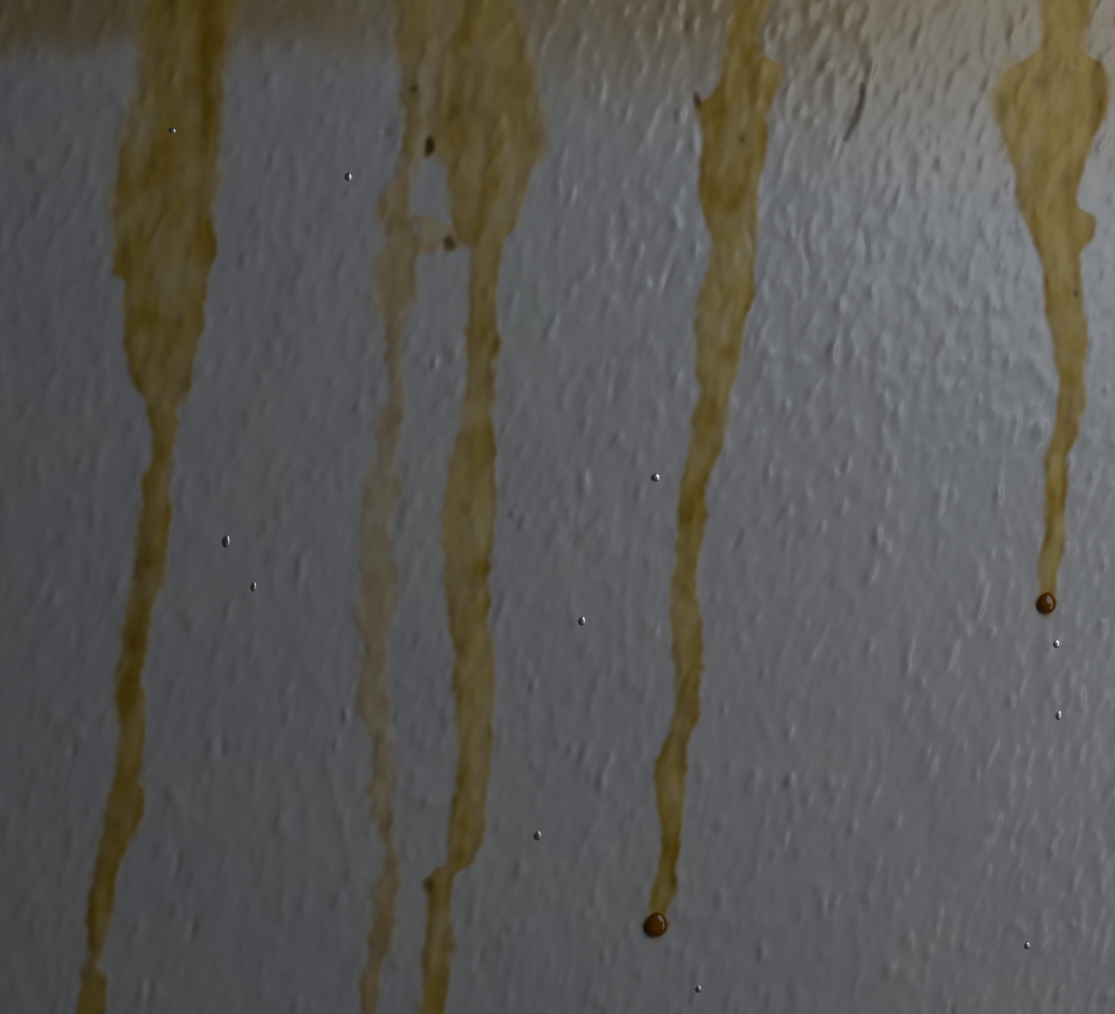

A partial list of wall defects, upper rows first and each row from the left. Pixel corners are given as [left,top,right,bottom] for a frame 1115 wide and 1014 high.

water stain [0,0,548,1014]
water stain [512,0,1115,938]